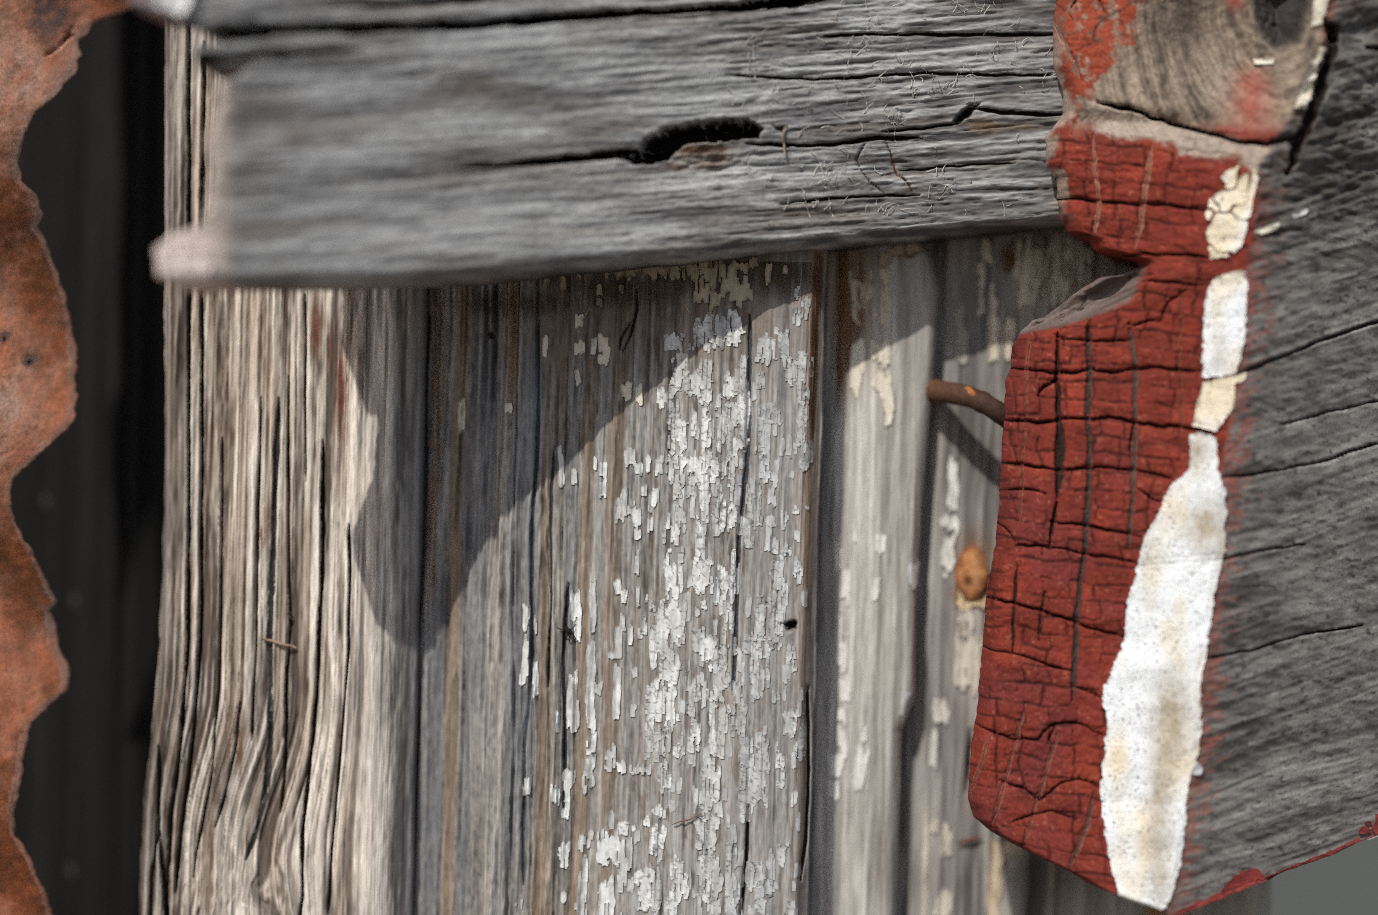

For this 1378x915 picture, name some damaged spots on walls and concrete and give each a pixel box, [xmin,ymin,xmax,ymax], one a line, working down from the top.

crack [186,0,821,230]
corrosion [23,262,67,366]
crack [150,291,352,915]
peeling [519,603,539,698]
crack [521,320,569,885]
peeling [550,256,814,915]
peeling [826,527,870,800]
peeling [849,244,927,427]
crack [725,0,1378,881]
peeling [1099,166,1378,915]
corrosion [0,762,44,914]
crack [739,805,750,915]